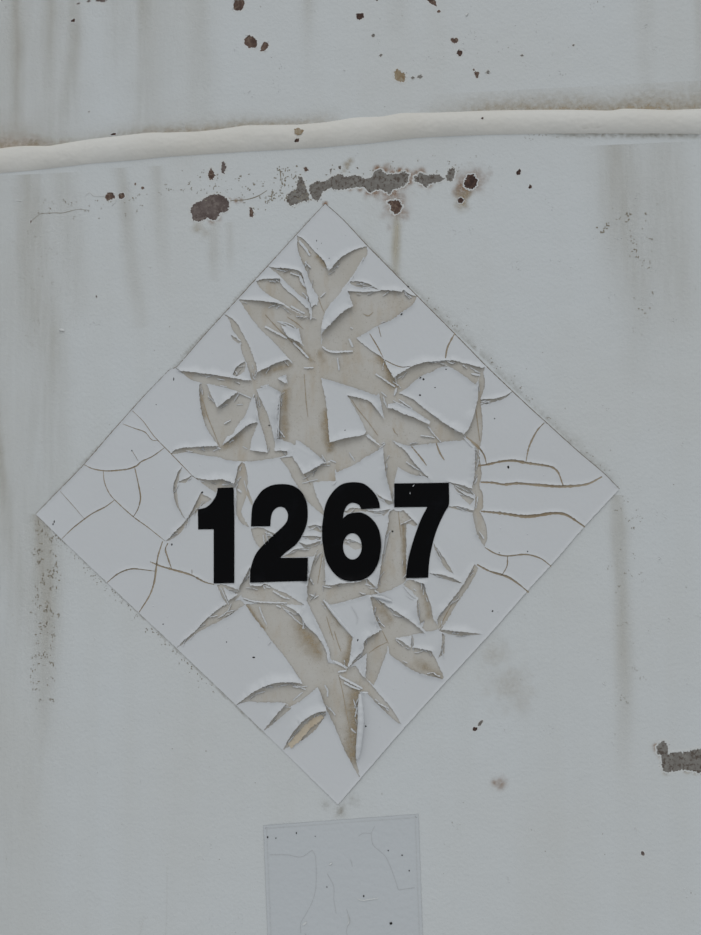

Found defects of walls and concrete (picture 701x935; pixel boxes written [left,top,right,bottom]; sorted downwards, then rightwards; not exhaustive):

peeling [188,159,232,224]
peeling [286,166,310,206]
peeling [414,168,480,205]
crack [466,423,602,488]
crack [60,411,214,612]
peeling [166,236,511,780]
crack [481,511,585,527]
crack [477,547,551,593]
peeling [654,738,701,776]